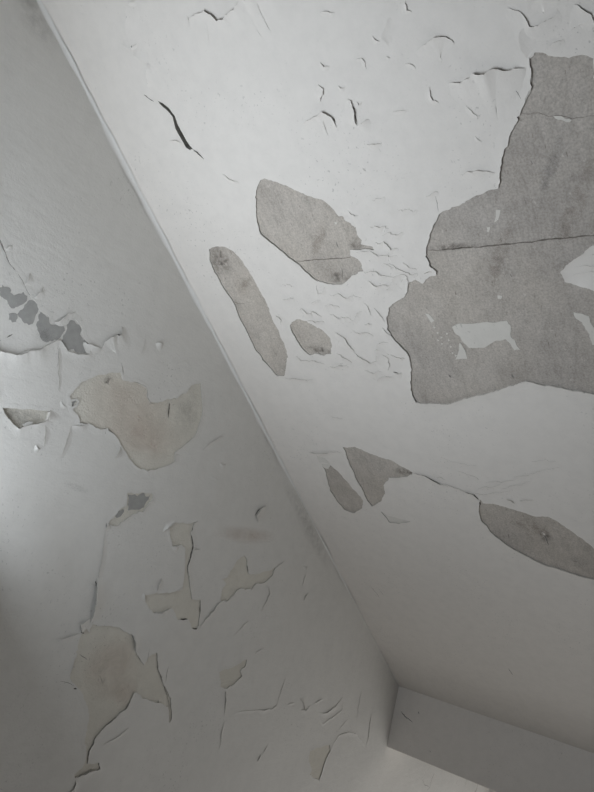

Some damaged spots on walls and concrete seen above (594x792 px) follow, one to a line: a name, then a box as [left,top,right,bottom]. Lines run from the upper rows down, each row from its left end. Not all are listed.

peeling [204,40,594,413]
peeling [0,215,206,478]
peeling [106,489,156,532]
peeling [141,519,204,634]
peeling [317,444,594,583]
peeling [60,620,175,792]